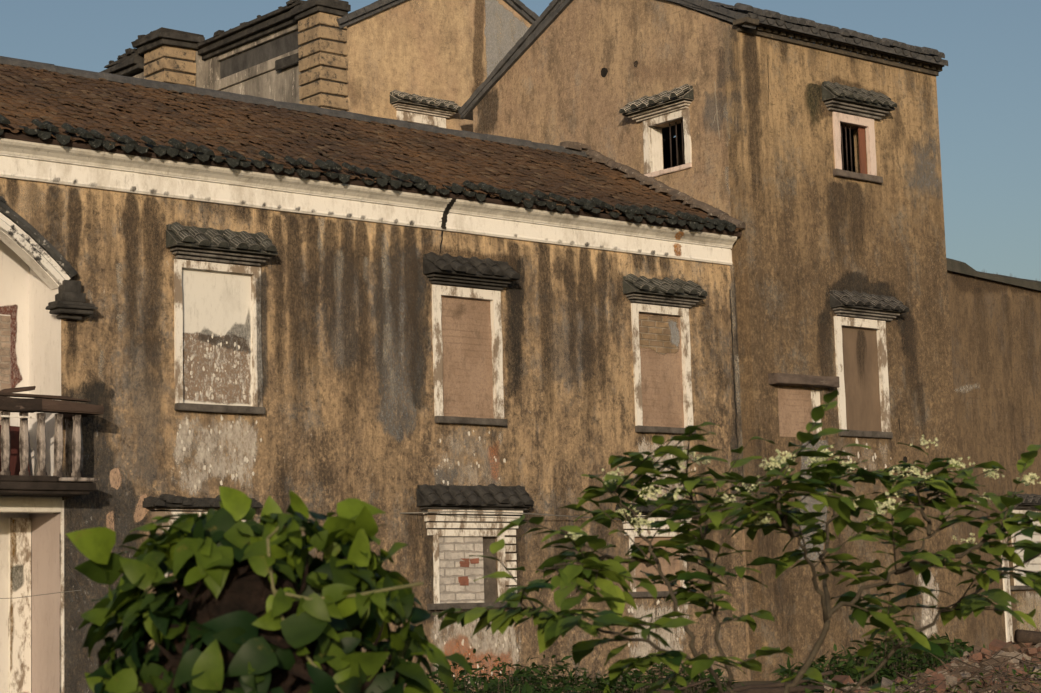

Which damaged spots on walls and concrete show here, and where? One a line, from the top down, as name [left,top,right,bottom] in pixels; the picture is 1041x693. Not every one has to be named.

water stain [473,0,484,92]
water stain [704,33,760,176]
water stain [7,178,18,205]
water stain [47,186,81,281]
water stain [117,194,162,363]
water stain [233,205,432,441]
water stain [538,244,553,404]
water stain [565,248,607,415]
water stain [633,254,669,271]
peeling [174,332,262,495]
water stain [511,528,523,575]
peeling [431,616,521,684]